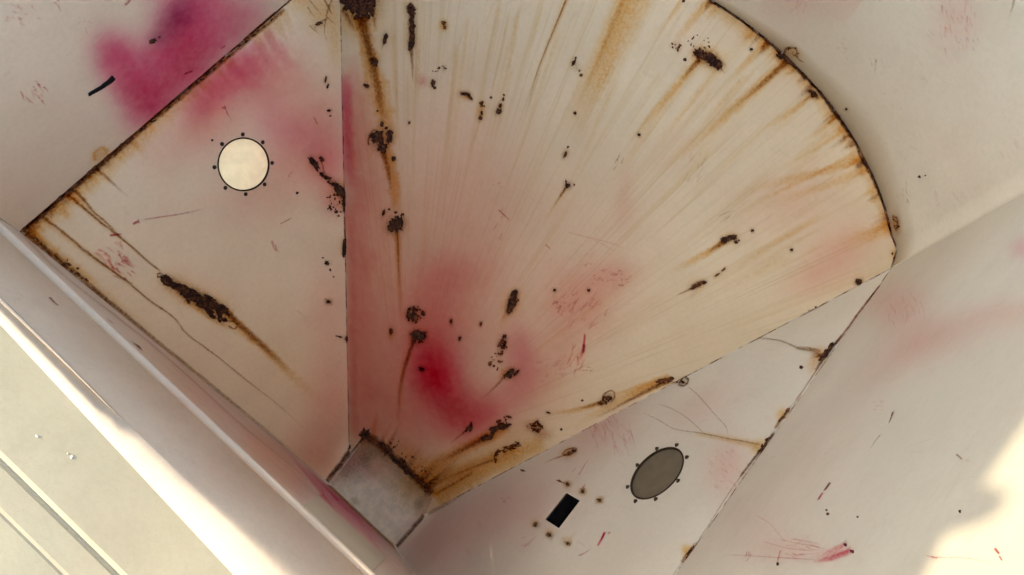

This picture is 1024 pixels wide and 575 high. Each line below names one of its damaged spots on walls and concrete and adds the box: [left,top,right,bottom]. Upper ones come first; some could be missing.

rust [329,0,389,88]
rust [671,35,723,71]
rust [368,110,396,174]
rust [708,0,900,232]
rust [22,11,282,352]
rust [308,156,347,258]
rust [382,208,405,245]
rust [718,234,740,246]
rust [506,289,519,314]
rust [488,334,520,379]
rust [461,415,522,463]
rust [741,408,790,475]